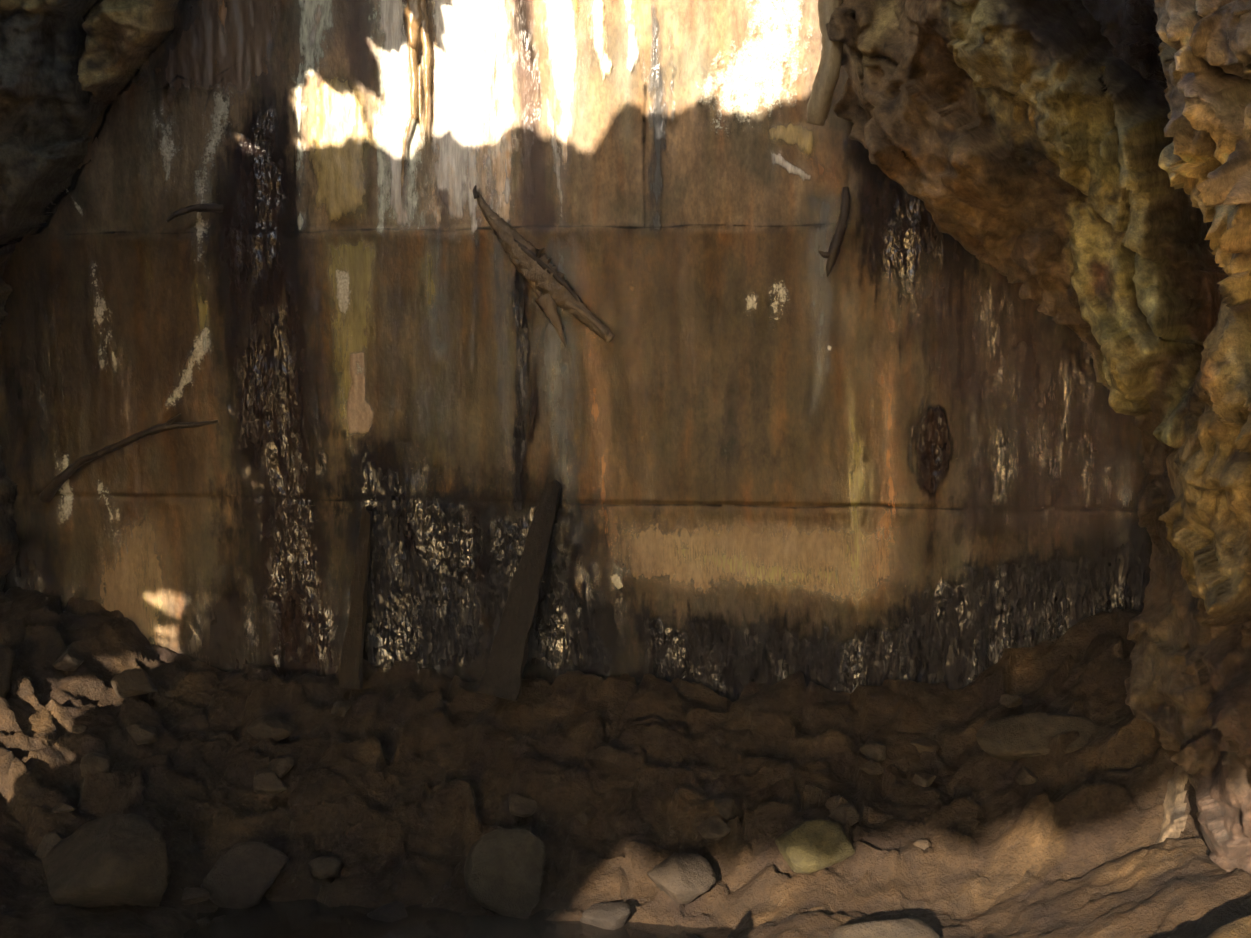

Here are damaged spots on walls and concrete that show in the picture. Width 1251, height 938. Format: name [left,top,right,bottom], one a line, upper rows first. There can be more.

leakage [150,109,182,192]
leakage [3,271,82,613]
leakage [165,0,1152,703]